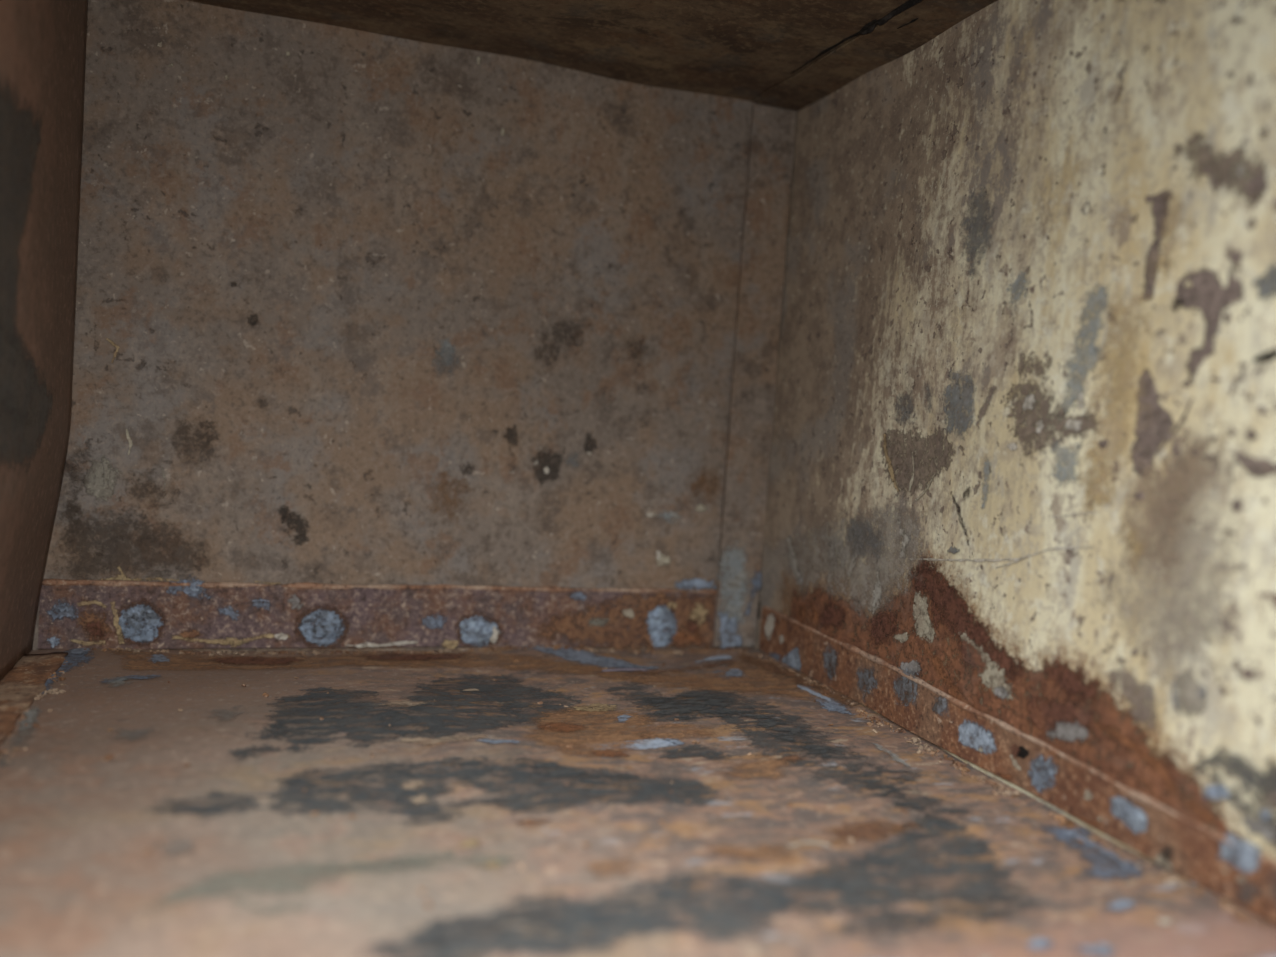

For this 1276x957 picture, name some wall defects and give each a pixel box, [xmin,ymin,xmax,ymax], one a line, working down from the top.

crack [791,0,923,74]
peeling [1172,129,1276,210]
peeling [1142,190,1173,301]
peeling [1130,250,1276,500]
corrosion [71,598,852,705]
corrosion [538,588,717,650]
water stain [696,571,762,677]
corrosion [782,551,1241,839]
peeling [1109,648,1157,729]
water stain [143,674,718,826]
water stain [356,658,1055,957]
water stain [153,851,518,912]